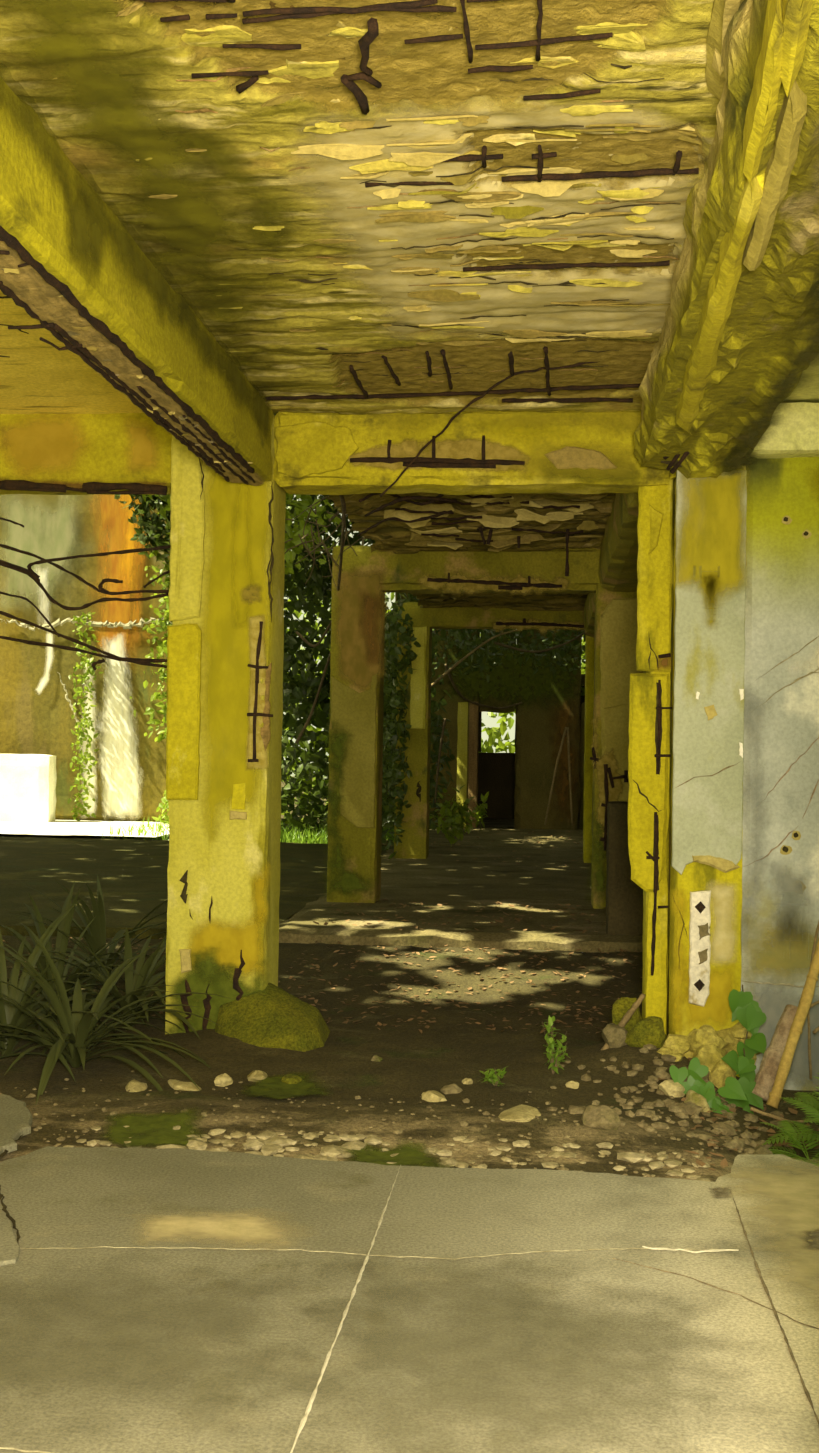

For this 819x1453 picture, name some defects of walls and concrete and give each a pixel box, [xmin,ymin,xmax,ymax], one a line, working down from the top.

peeling [0,0,704,828]
peeling [492,0,813,976]
damp [705,576,717,624]
damp [673,851,759,1024]
damp [753,987,819,1087]
crack [0,1135,819,1329]